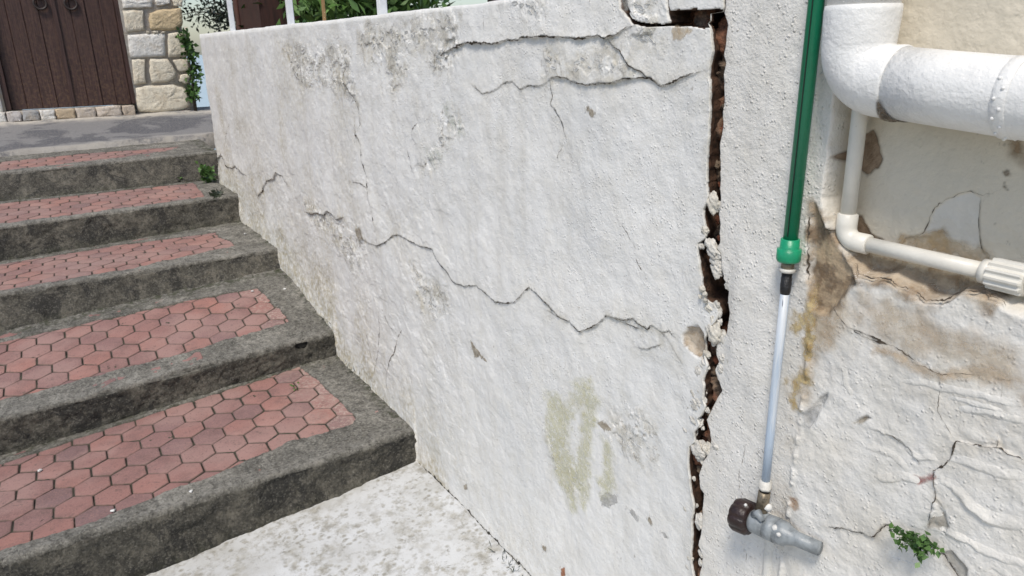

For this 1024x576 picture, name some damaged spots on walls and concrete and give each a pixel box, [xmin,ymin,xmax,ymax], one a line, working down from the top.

spalling [862,130,883,174]
spalling [857,216,882,240]
crack [365,10,729,576]
damp [548,383,595,509]
crack [834,310,1023,530]